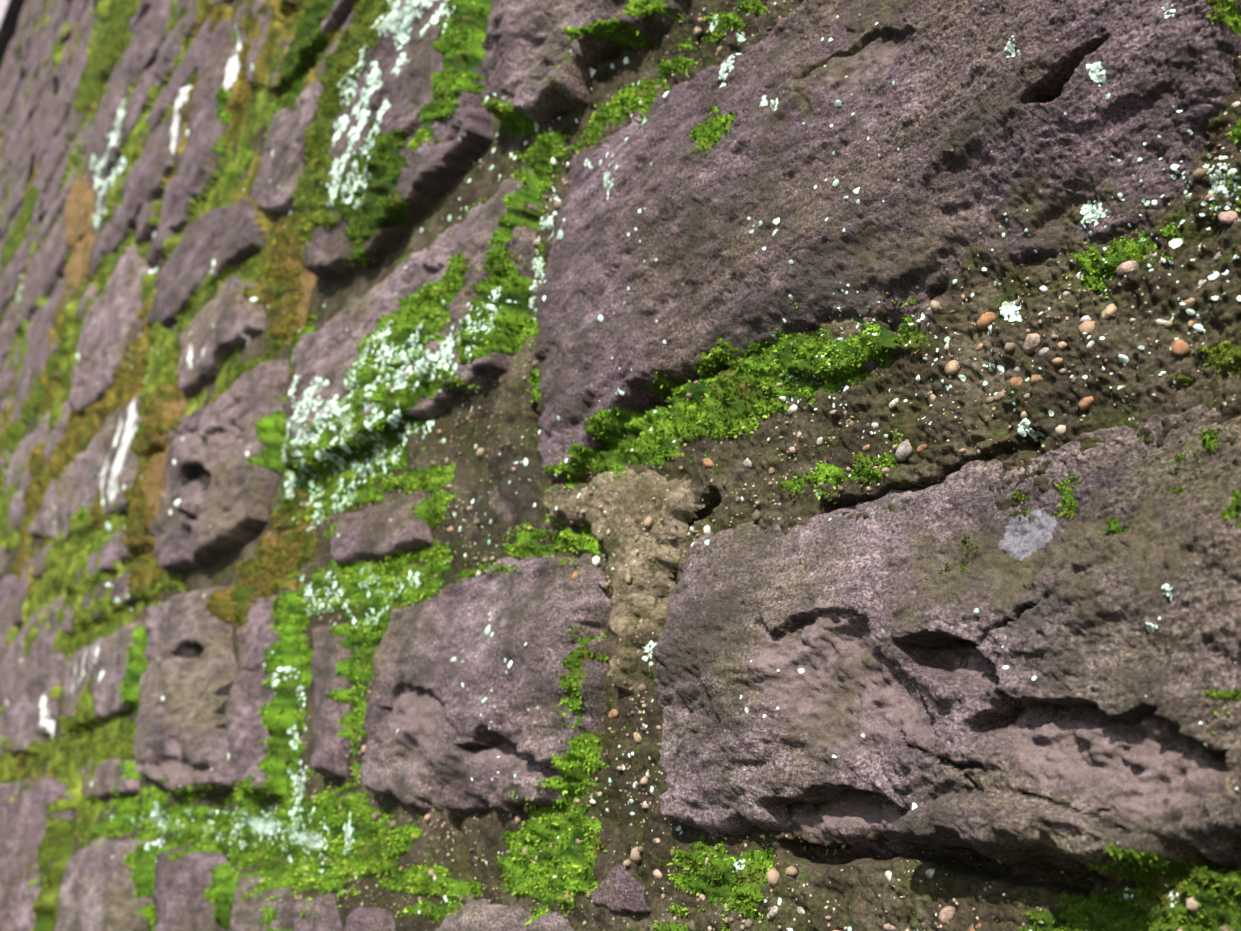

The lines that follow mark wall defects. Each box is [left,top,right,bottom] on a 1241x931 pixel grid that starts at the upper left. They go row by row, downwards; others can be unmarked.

crack [978,595,1049,646]
crack [900,730,984,784]
crack [1023,792,1131,834]